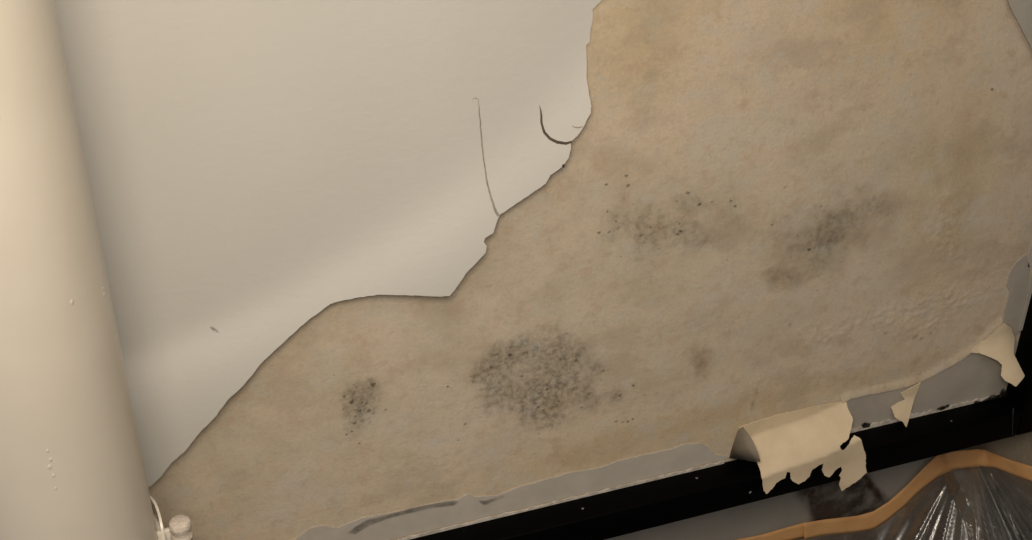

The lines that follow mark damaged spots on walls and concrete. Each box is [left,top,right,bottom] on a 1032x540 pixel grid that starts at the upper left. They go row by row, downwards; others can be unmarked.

crack [474,97,500,217]
crack [539,105,583,145]
peeling [54,0,602,487]
peeling [840,315,1018,429]